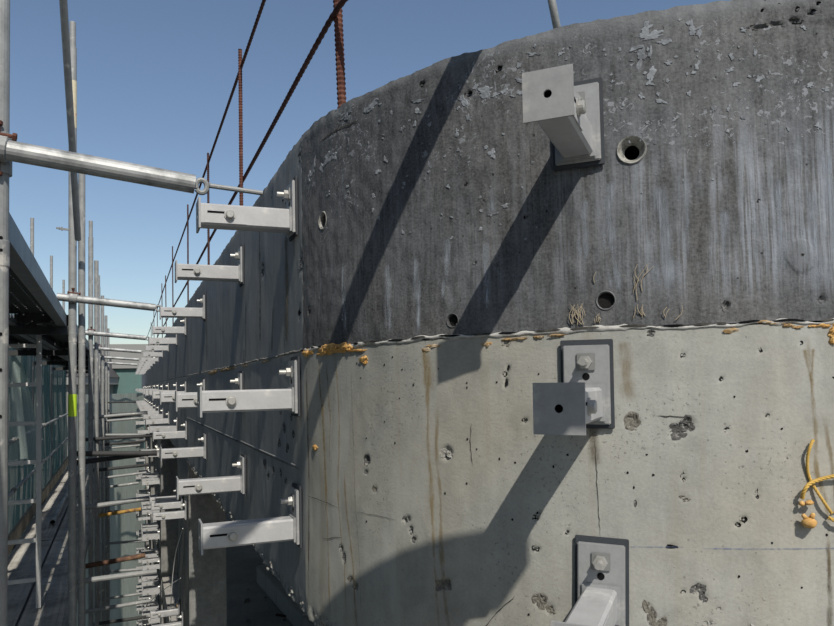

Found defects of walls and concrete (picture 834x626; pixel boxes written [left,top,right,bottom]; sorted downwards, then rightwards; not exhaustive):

peeling [457,59,526,121]
peeling [618,20,672,104]
peeling [678,18,703,76]
spalling [740,1,821,36]
crack [593,439,601,537]
spalling [531,593,556,614]